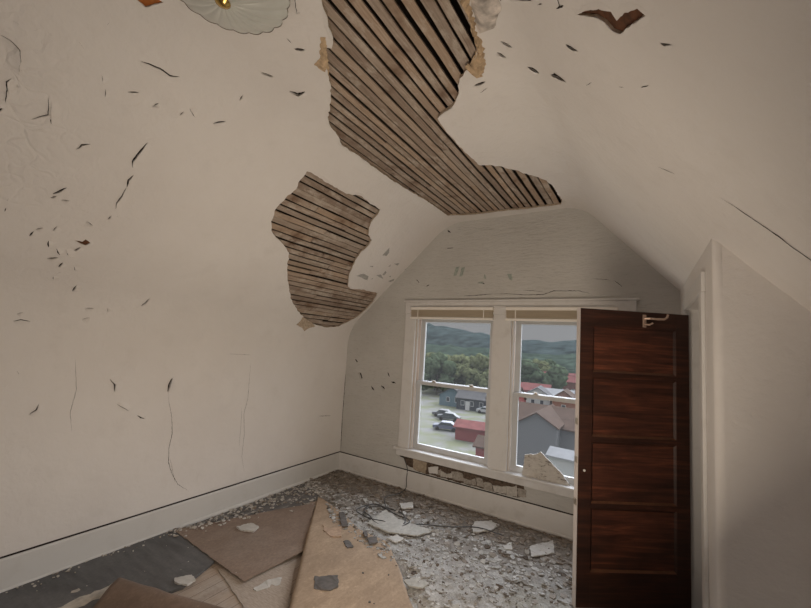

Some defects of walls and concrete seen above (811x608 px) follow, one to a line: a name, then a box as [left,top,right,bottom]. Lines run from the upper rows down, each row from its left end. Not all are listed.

peeling [134,0,166,11]
flaking render [319,0,333,49]
peeling [0,35,22,127]
flaking render [324,69,513,217]
flaking render [438,70,565,210]
flaking render [269,170,406,328]
crack [167,378,183,488]
flaking render [400,456,527,498]